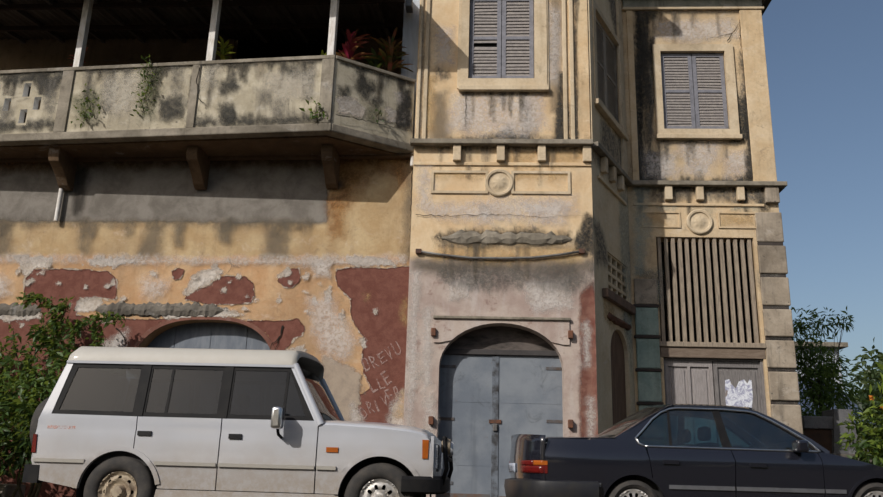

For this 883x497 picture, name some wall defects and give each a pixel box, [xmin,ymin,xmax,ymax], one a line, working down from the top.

water stain [0,72,63,133]
water stain [75,66,192,121]
water stain [194,60,322,127]
water stain [433,94,446,139]
water stain [462,92,541,139]
water stain [545,0,578,139]
water stain [634,11,770,212]
water stain [140,226,161,255]
water stain [267,223,288,255]
peeling [0,254,436,431]
peeling [0,411,77,497]